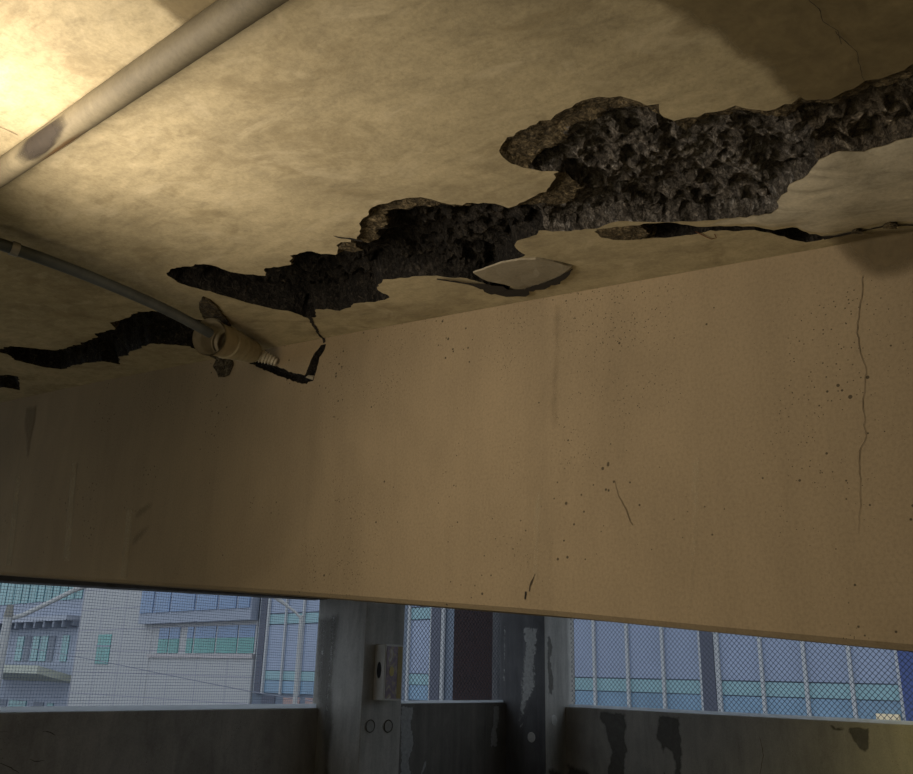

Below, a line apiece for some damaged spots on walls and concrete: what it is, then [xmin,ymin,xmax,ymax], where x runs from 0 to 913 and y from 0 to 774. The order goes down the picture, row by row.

damp [159,0,217,24]
damp [660,0,913,100]
spalling [0,64,913,369]
crack [0,375,20,390]
spalling [210,356,234,377]
crack [250,344,326,384]
crack [856,276,866,530]
damp [521,628,553,715]
damp [600,712,627,774]
damp [657,717,682,774]
damp [832,726,869,751]